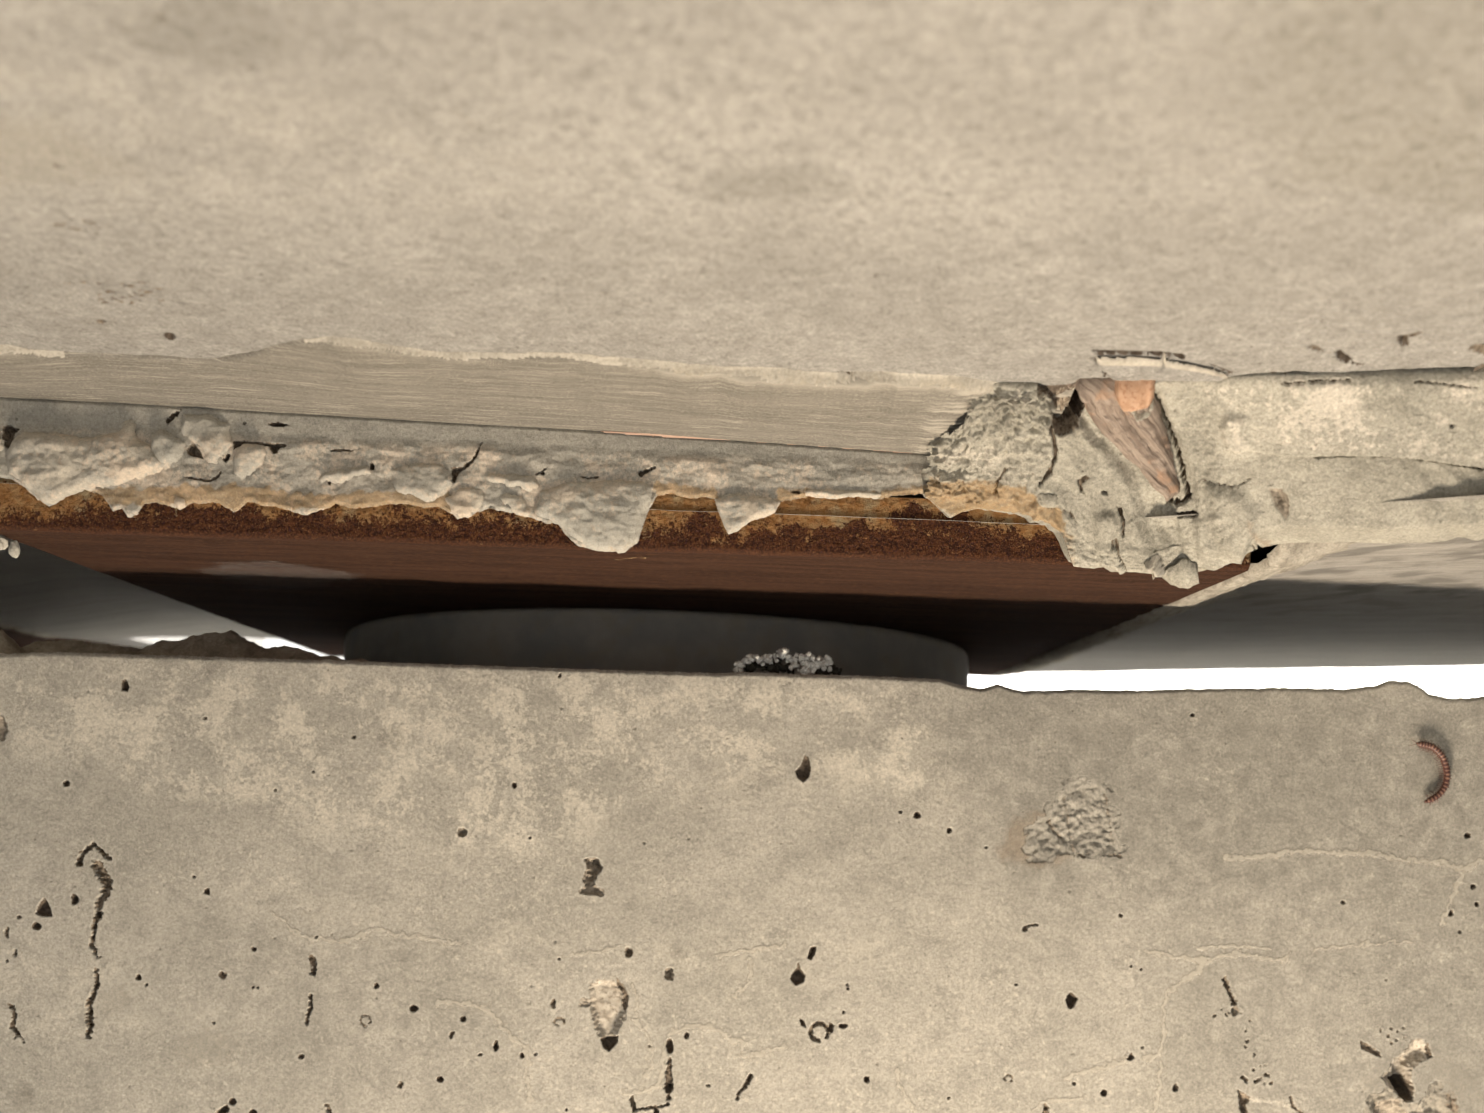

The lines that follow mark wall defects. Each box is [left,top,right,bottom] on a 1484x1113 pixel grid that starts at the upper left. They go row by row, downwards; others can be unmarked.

spalling [1036,383,1085,436]